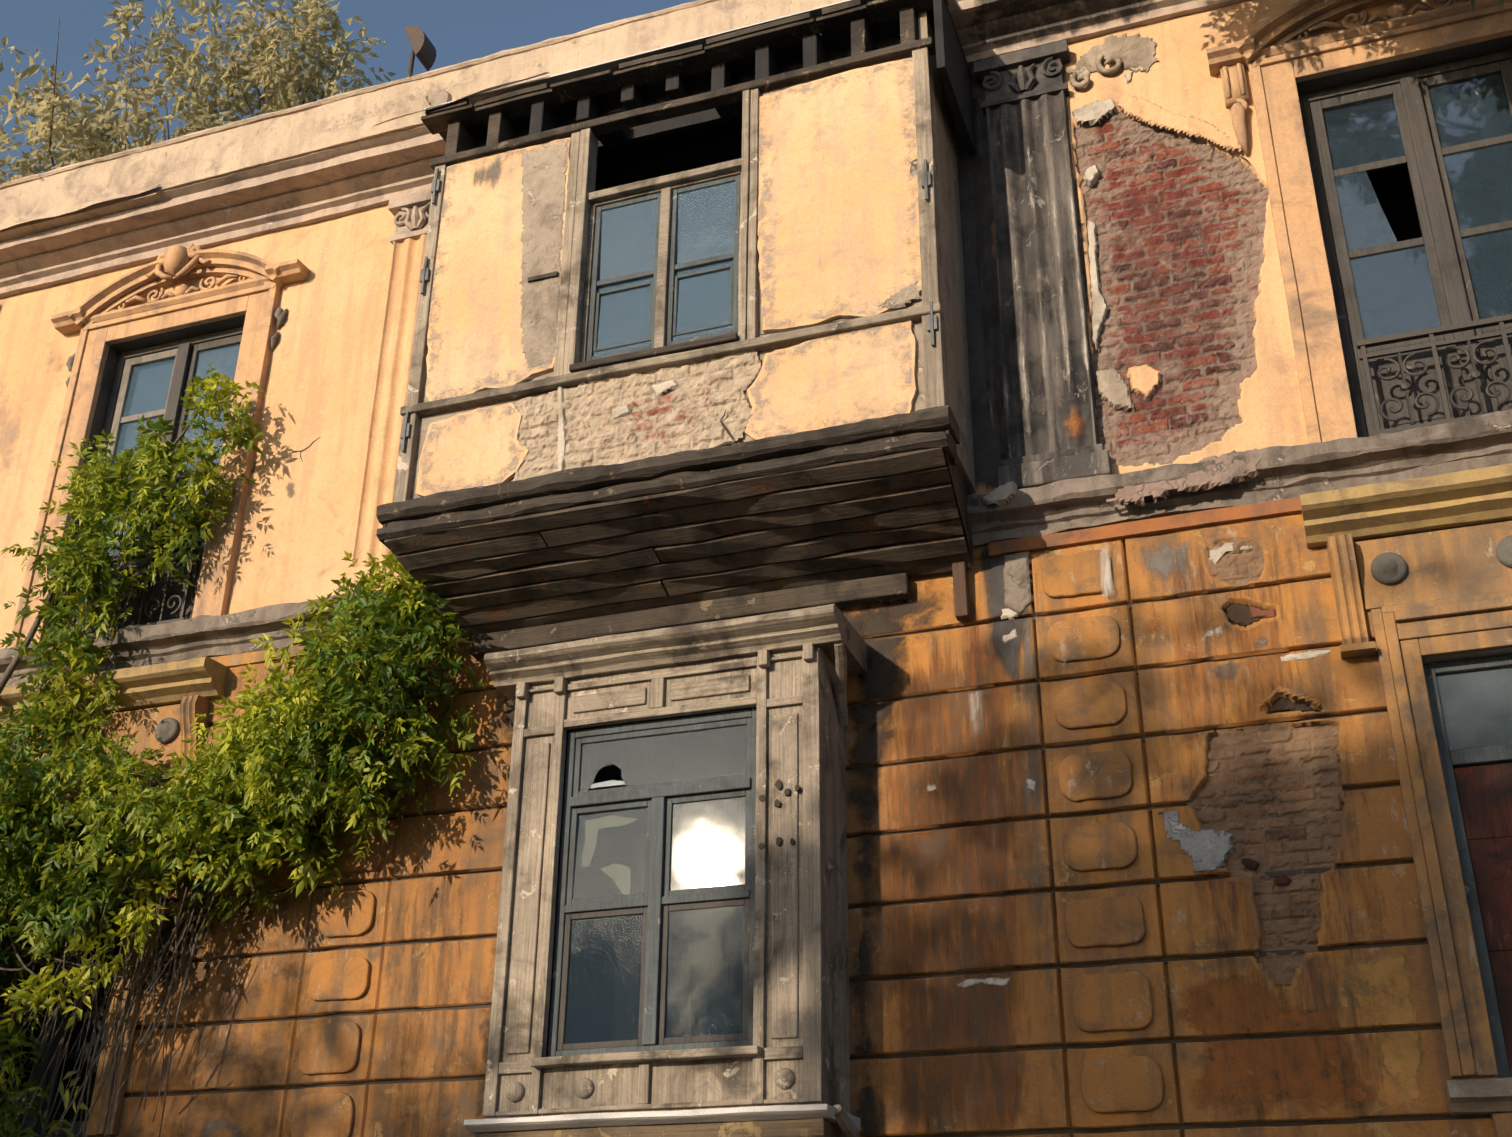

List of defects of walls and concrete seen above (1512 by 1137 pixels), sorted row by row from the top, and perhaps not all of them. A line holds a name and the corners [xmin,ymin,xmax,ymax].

damp [968,0,1152,46]
peeling [875,59,917,218]
flaking render [460,141,570,389]
flaking render [812,273,922,383]
flaking render [1068,33,1269,467]
flaking render [463,337,830,489]
spalling [1001,551,1034,643]
spalling [1206,538,1276,628]
damp [849,611,905,1054]
flaking render [1159,687,1344,986]
damp [856,1086,880,1137]